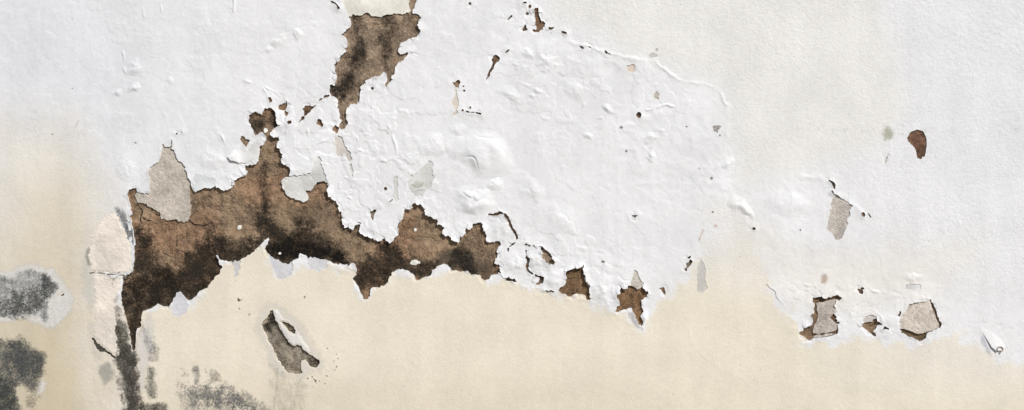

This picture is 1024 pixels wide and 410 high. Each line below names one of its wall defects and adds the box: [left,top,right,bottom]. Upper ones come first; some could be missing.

water stain [250,111,278,132]
water stain [330,15,366,98]
spalling [299,0,422,177]
water stain [379,14,396,60]
spalling [907,130,927,159]
spalling [87,97,516,353]
water stain [0,263,73,329]
water stain [100,162,514,410]
spalling [525,243,596,300]
spalling [615,270,666,330]
spalling [799,293,841,340]
water stain [0,339,46,410]